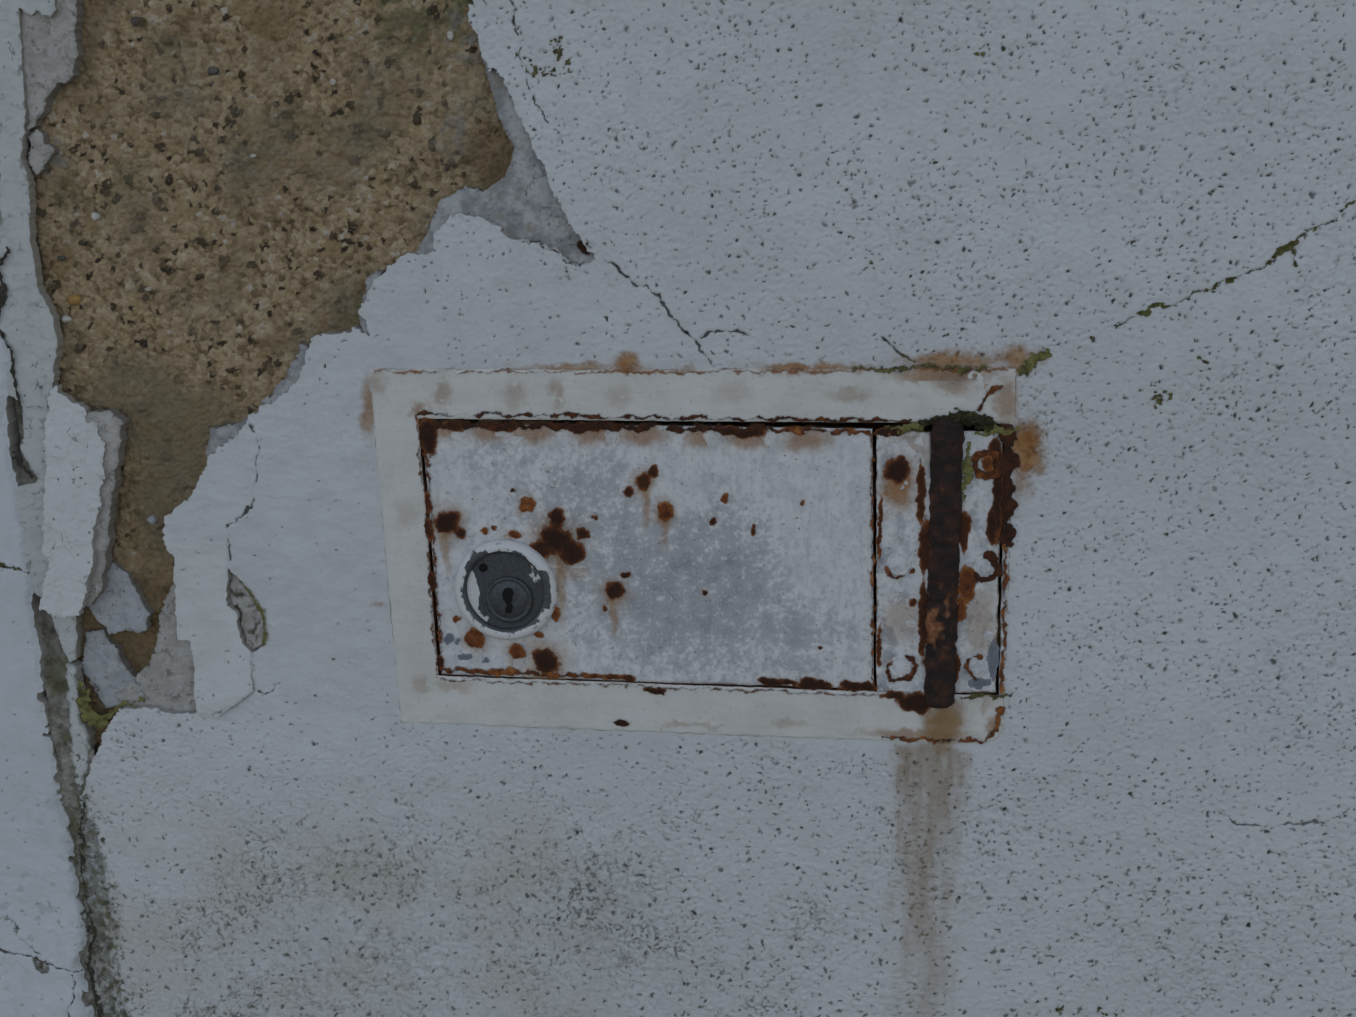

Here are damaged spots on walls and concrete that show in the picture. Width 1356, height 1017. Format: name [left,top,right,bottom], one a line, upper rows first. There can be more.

spalling [21,0,595,755]
corrosion [551,361,596,370]
corrosion [616,353,637,370]
crack [610,262,746,365]
corrosion [919,351,986,368]
crack [1090,200,1356,340]
corrosion [1012,425,1043,482]
crack [0,0,132,1017]